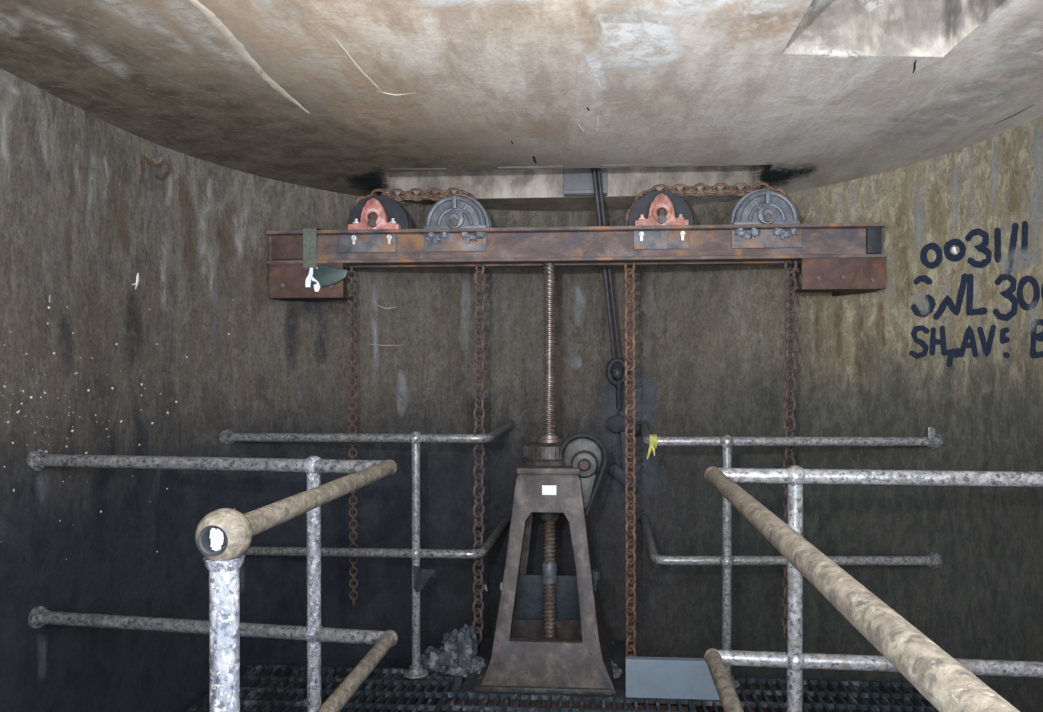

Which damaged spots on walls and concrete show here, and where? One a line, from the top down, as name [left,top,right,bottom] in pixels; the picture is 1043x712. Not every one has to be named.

water stain [0,110,10,174]
water stain [200,179,214,289]
water stain [234,206,248,258]